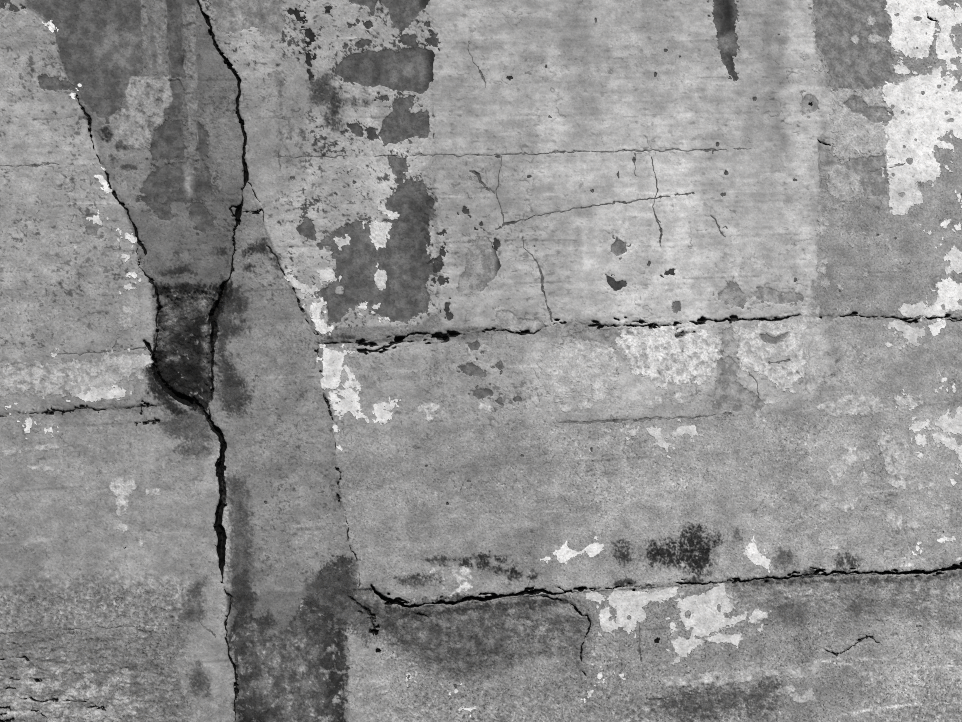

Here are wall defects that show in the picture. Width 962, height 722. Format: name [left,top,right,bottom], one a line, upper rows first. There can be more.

crack [0,160,73,168]
crack [29,0,264,720]
leakage [150,264,252,414]
leakage [242,238,279,271]
peeling [284,0,501,432]
crack [266,147,962,676]
peeling [809,0,962,215]
peeling [883,218,962,350]
crack [2,625,140,634]
leakage [174,476,376,722]
spalling [362,536,962,695]
leakage [646,523,722,584]